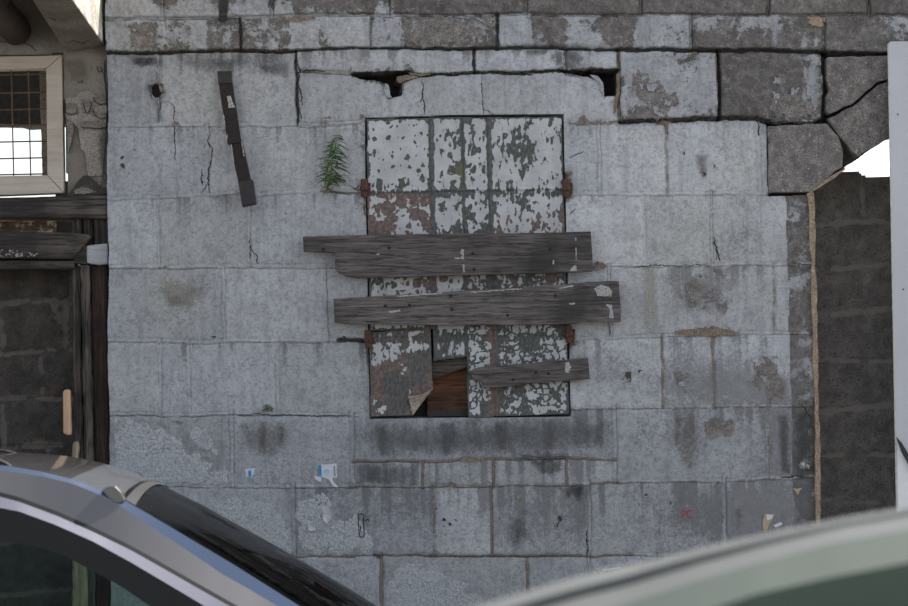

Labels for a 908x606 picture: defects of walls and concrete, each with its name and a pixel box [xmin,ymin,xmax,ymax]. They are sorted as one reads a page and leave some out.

crack [156,66,180,159]
crack [295,50,325,119]
spalling [353,71,430,98]
peeling [565,69,679,133]
crack [200,124,213,194]